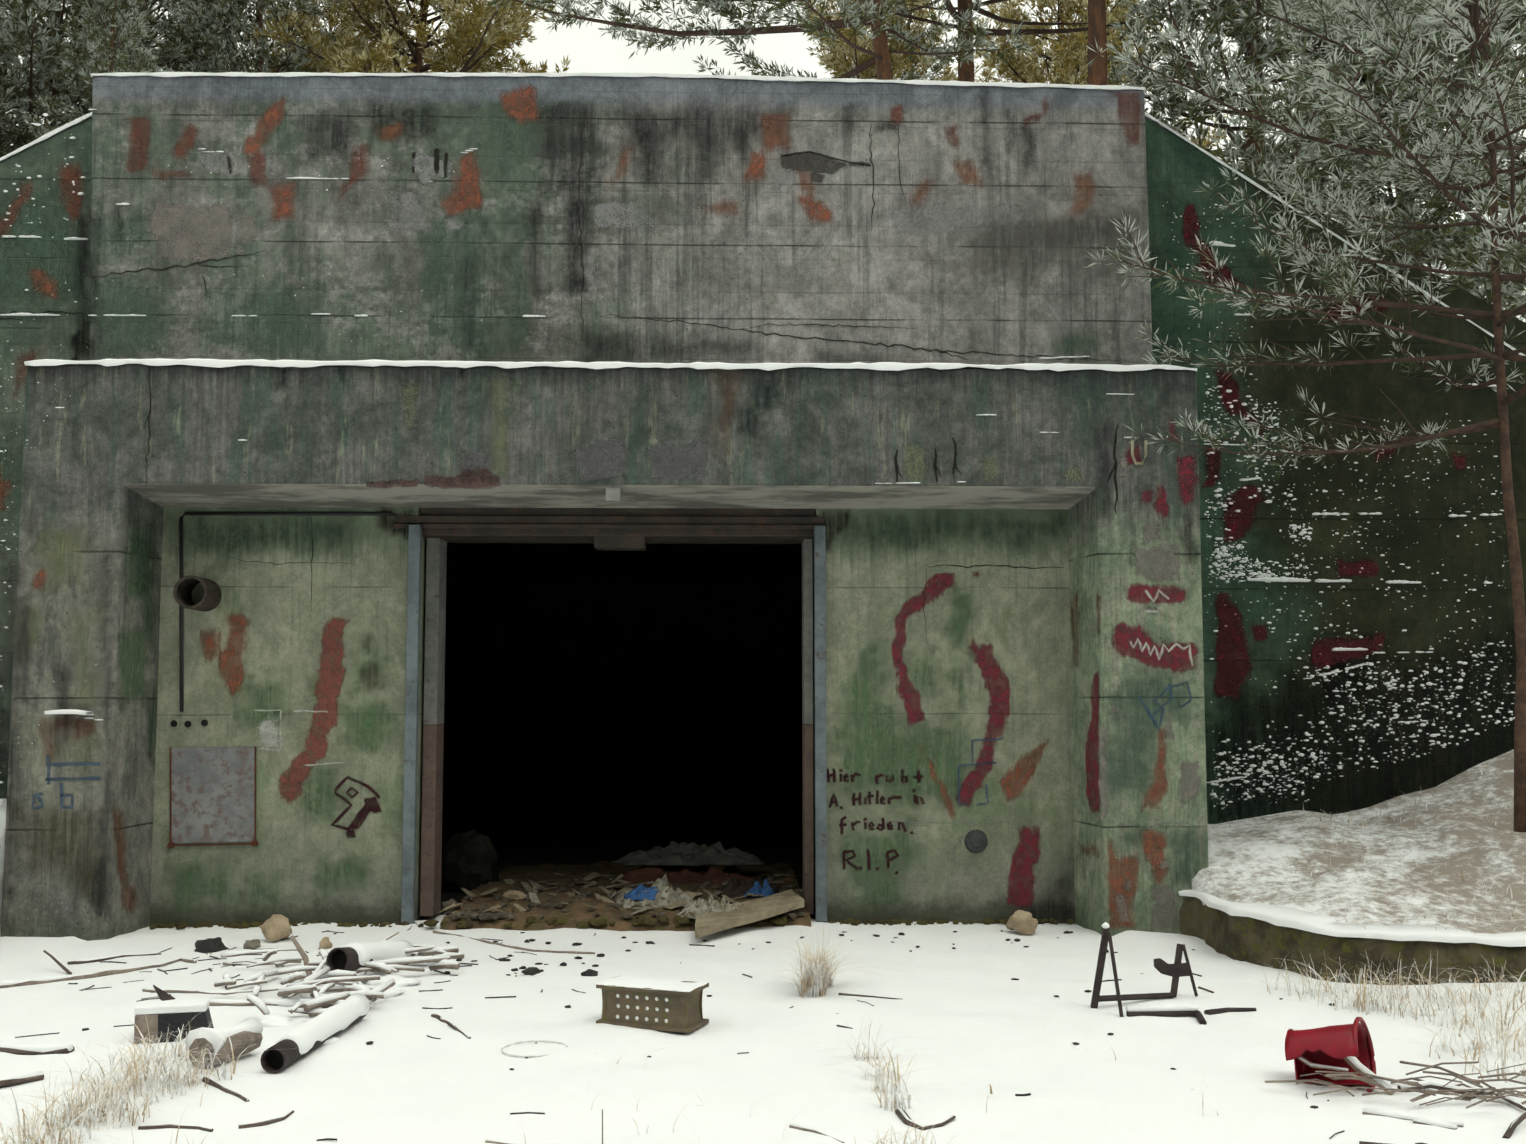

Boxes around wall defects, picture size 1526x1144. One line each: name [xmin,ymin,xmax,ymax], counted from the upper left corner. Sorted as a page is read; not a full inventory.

crack [0,250,265,320]
water stain [543,105,595,288]
water stain [630,112,772,183]
crack [577,104,1140,363]